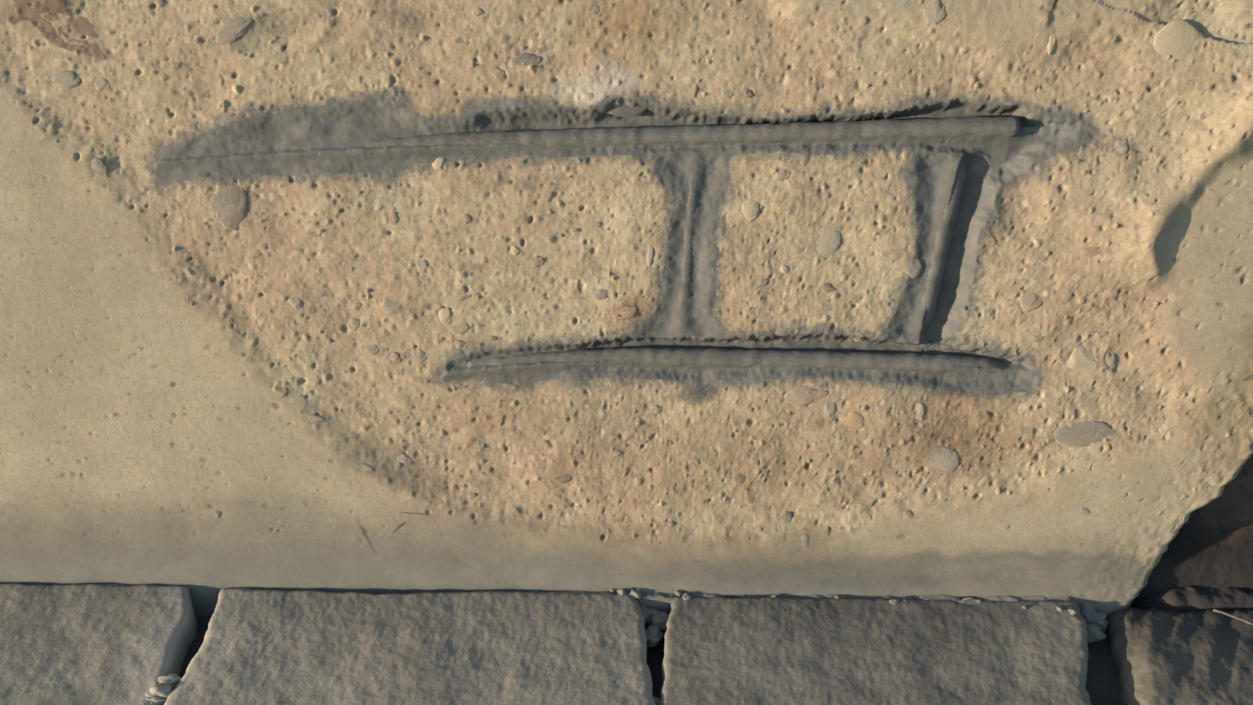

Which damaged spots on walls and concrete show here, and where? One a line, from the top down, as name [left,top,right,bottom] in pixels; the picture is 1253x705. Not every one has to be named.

spalling [0,0,1253,549]
crack [1036,0,1064,44]